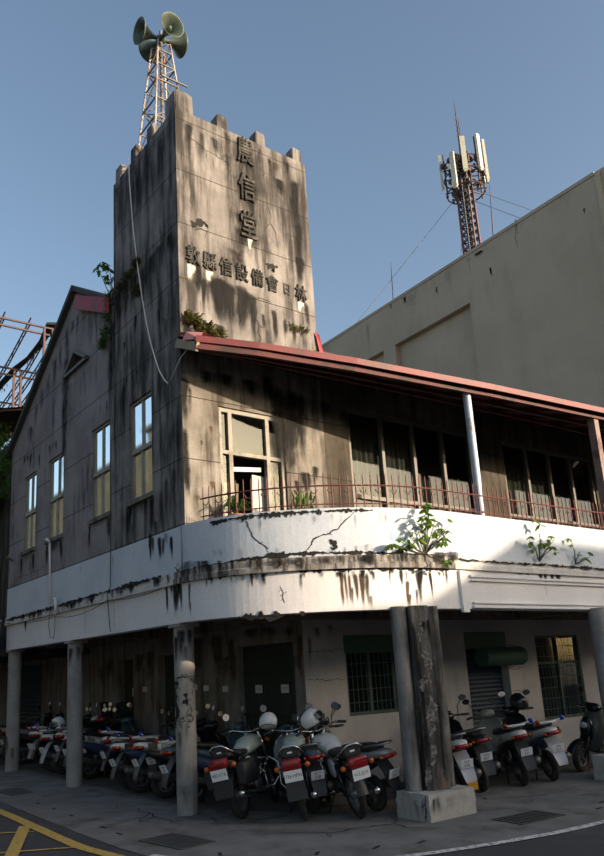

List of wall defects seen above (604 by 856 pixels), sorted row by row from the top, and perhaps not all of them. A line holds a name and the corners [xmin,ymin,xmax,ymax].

damp [186,125,226,150]
damp [231,144,255,262]
damp [260,153,304,277]
damp [179,264,296,352]
damp [181,378,191,416]
damp [165,430,190,501]
damp [243,377,318,493]
damp [126,498,173,557]
crack [306,512,354,550]
damp [7,573,182,631]
damp [183,533,604,603]
peeling [417,622,450,790]